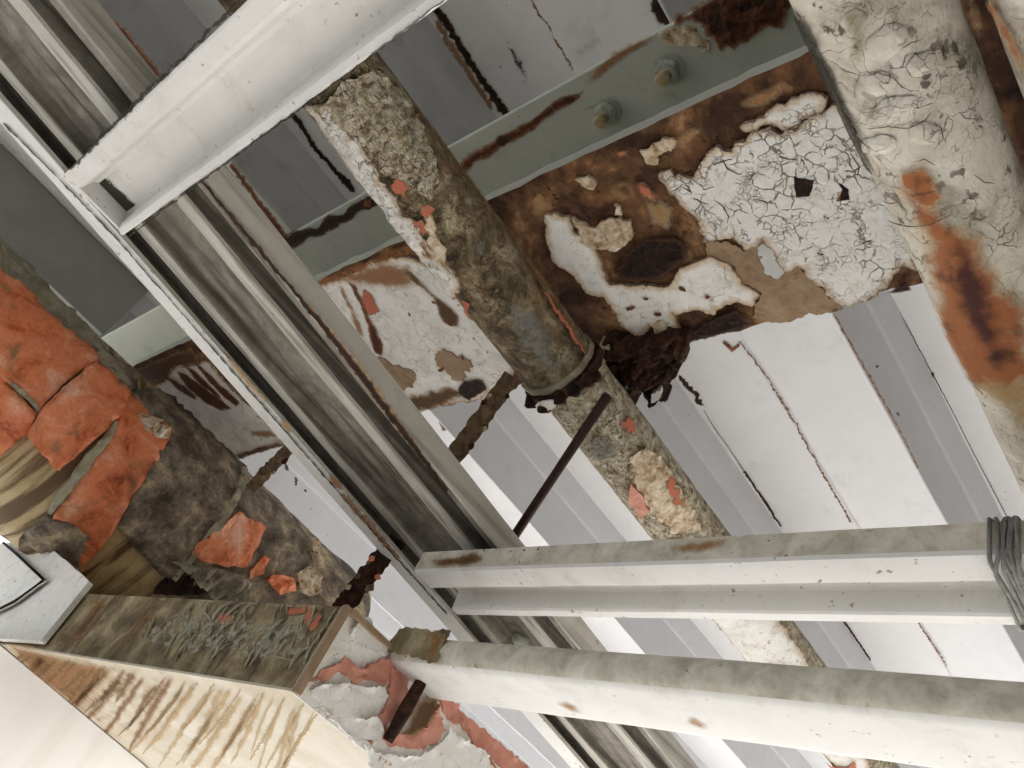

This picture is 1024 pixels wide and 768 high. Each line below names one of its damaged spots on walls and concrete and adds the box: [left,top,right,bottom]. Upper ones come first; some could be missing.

rust [651,0,791,53]
crack [832,61,913,92]
rust [199,179,459,492]
peeling [304,69,515,412]
rust [599,311,758,408]
peeling [544,91,917,337]
crack [846,110,989,227]
rust [901,170,1024,428]
peeling [627,447,701,534]
peeling [145,511,337,669]
damp [14,646,320,768]
peeling [310,617,529,768]